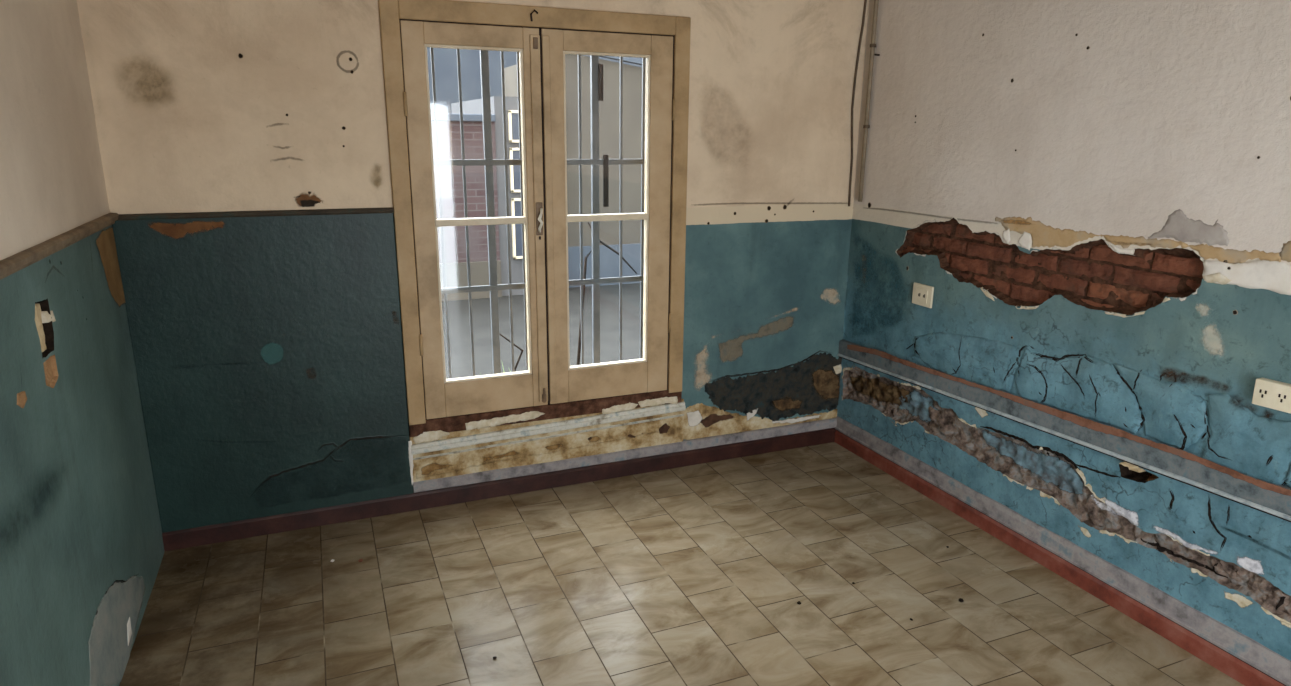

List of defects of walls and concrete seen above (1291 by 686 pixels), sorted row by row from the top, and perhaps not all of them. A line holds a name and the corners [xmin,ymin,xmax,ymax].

spalling [896,209,1291,318]
peeling [17,391,27,408]
spalling [35,298,58,388]
crack [906,336,920,356]
crack [949,336,962,375]
crack [993,344,1232,461]
spalling [413,366,1291,628]
crack [980,426,1119,477]
crack [1140,488,1252,578]
crack [1265,454,1291,486]
peeling [88,575,145,686]